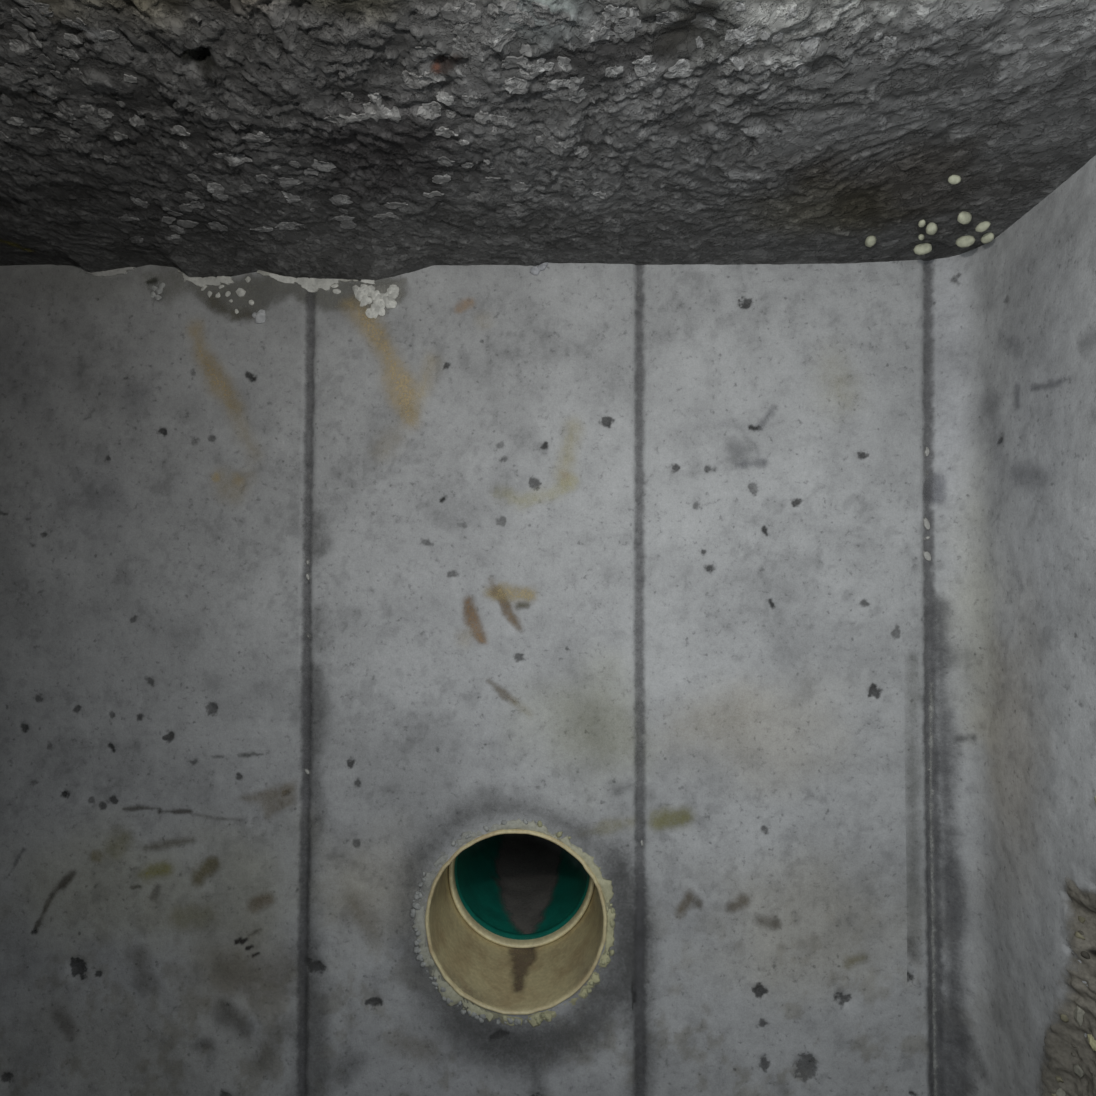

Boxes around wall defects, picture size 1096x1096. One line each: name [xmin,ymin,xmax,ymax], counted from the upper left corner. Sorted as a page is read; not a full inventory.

rust [465,599,485,642]
rust [490,588,533,625]
spalling [1041,879,1096,1096]